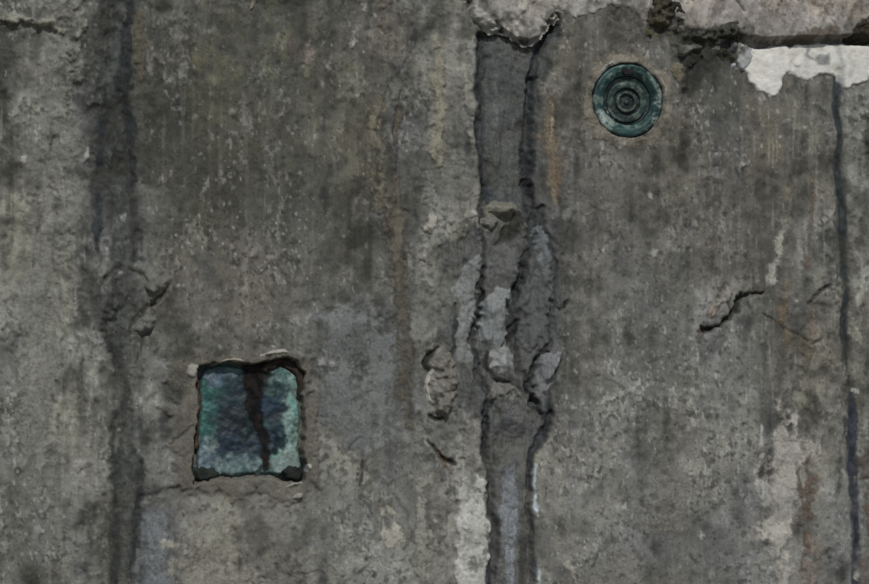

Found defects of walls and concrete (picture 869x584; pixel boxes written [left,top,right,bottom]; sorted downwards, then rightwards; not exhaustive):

flaking render [0,3,88,81]
leakage [474,33,491,176]
leakage [524,16,559,122]
leakage [832,77,848,239]
leakage [469,190,492,452]
leakage [506,142,557,526]
crack [697,293,746,333]
leakage [839,251,849,360]
crack [427,441,456,473]
leakage [838,388,861,584]